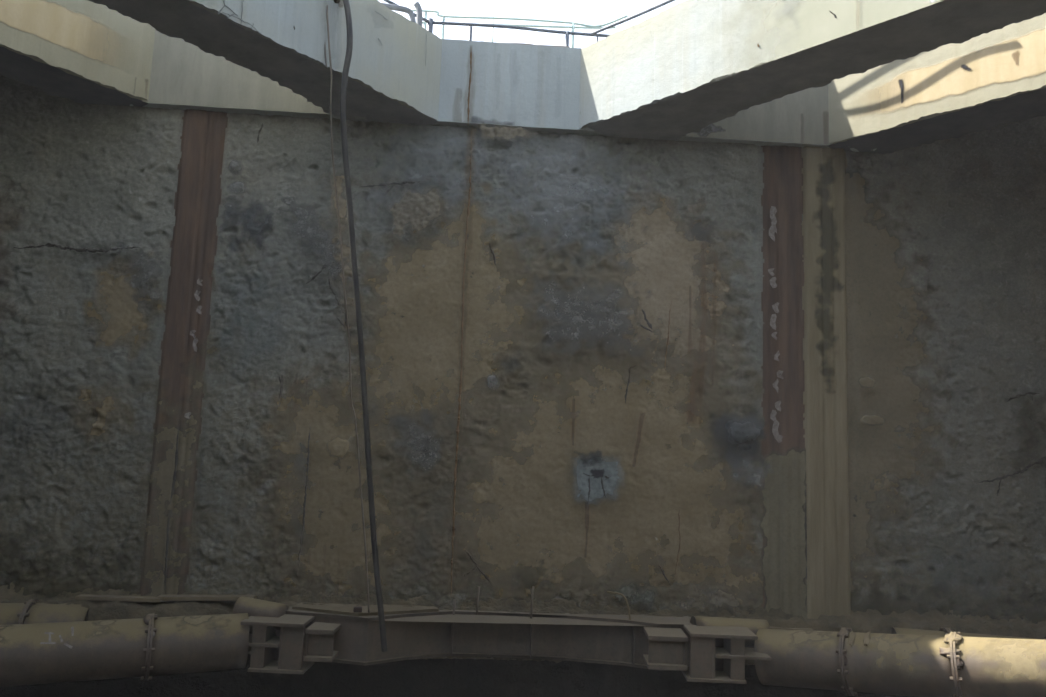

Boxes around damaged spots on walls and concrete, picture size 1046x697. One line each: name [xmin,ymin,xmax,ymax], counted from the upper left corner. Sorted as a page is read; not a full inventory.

spalling [574,451,622,506]